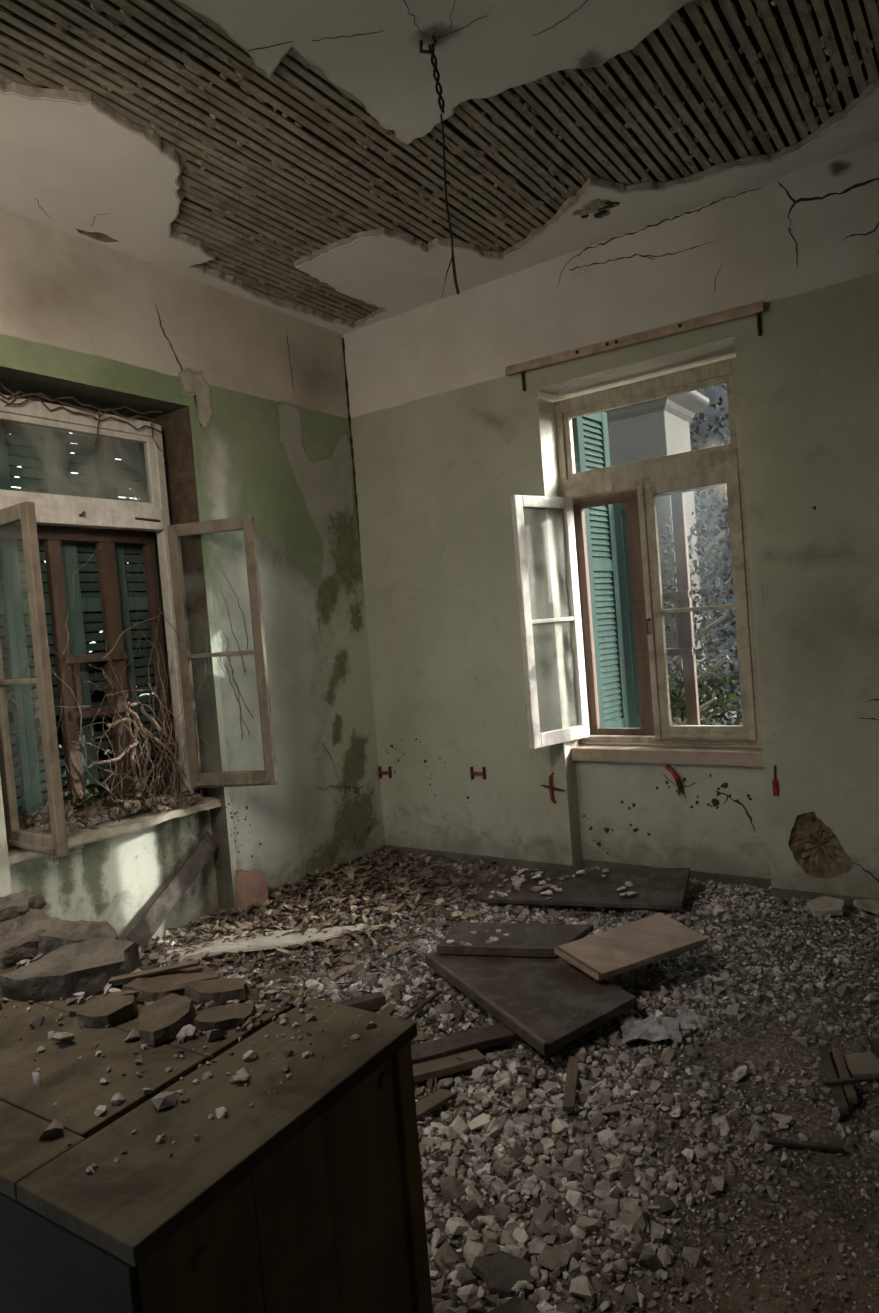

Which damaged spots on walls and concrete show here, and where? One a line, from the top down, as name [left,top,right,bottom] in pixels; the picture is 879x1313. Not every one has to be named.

crack [247,0,489,52]
flaking render [0,0,879,329]
crack [558,178,879,292]
crack [154,303,197,401]
peeling [278,403,354,582]
leakage [214,512,375,875]
leakage [23,841,107,915]
leakage [156,810,206,883]
spalling [789,811,854,879]